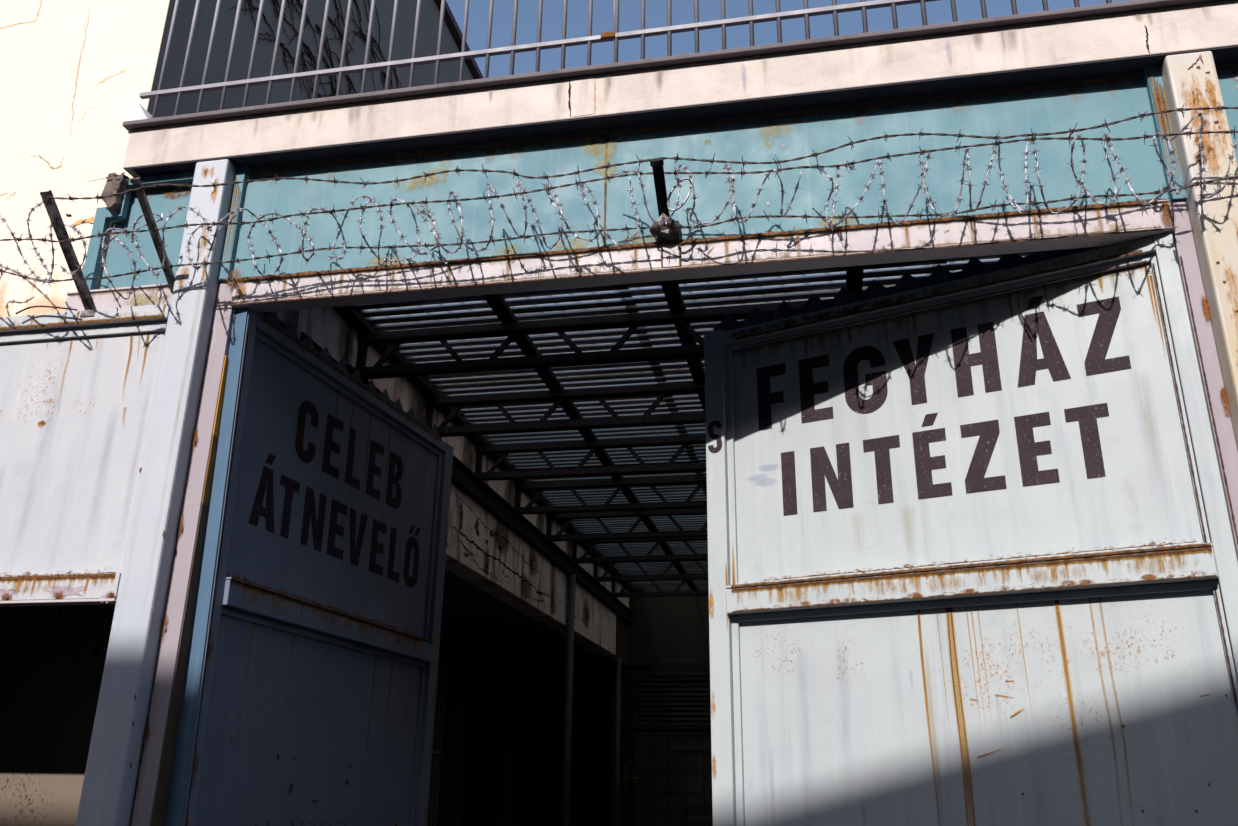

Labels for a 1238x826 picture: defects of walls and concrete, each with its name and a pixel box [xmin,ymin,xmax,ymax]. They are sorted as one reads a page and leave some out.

crack [29,2,129,169]
rust [131,187,190,198]
rust [200,169,240,283]
rust [227,138,1174,441]
rust [1147,72,1180,166]
rust [1182,63,1238,170]
rust [0,570,117,601]
rust [129,330,213,826]
rust [185,330,433,826]
rust [709,248,1238,826]